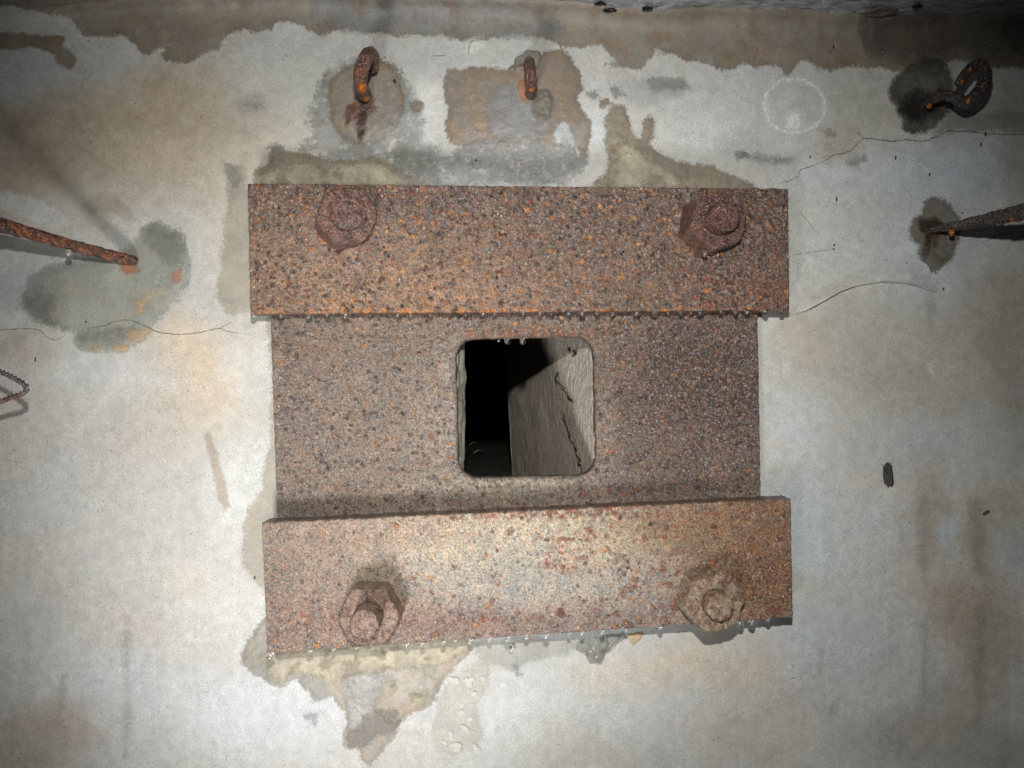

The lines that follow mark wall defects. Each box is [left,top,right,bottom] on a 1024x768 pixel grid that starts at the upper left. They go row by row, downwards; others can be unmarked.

corrosion [346,95,376,139]
water stain [0,0,1024,185]
crack [777,130,1022,184]
water stain [910,198,961,272]
crack [91,320,240,335]
spalling [576,632,644,665]
flaking render [241,618,472,765]